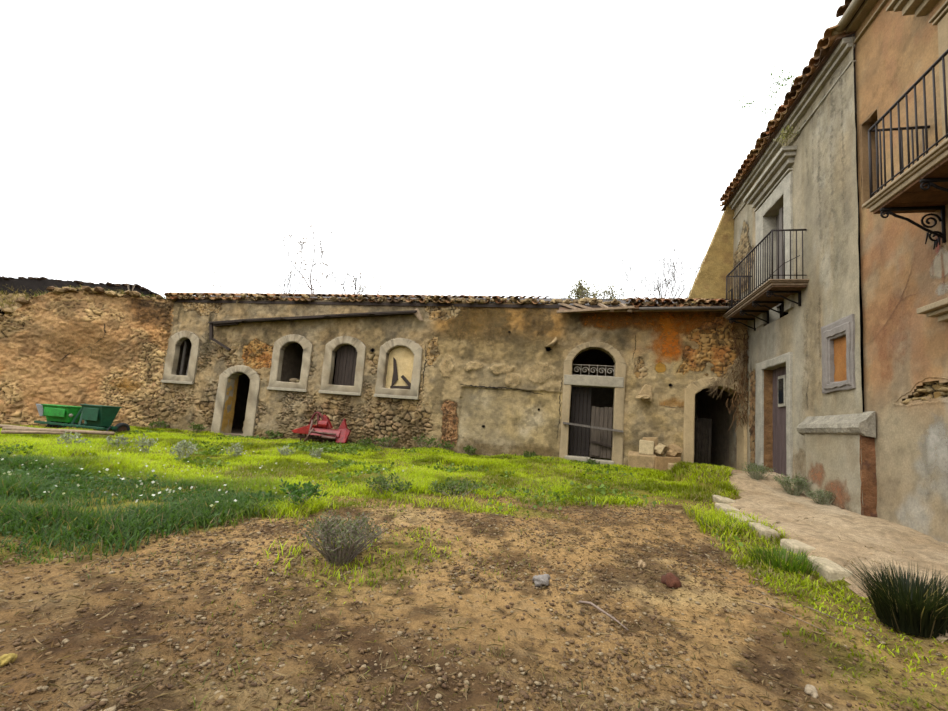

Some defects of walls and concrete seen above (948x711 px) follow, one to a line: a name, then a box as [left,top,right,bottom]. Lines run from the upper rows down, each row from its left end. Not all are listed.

peeling [242,338,273,369]
flaking render [676,317,744,378]
flaking render [893,375,948,407]